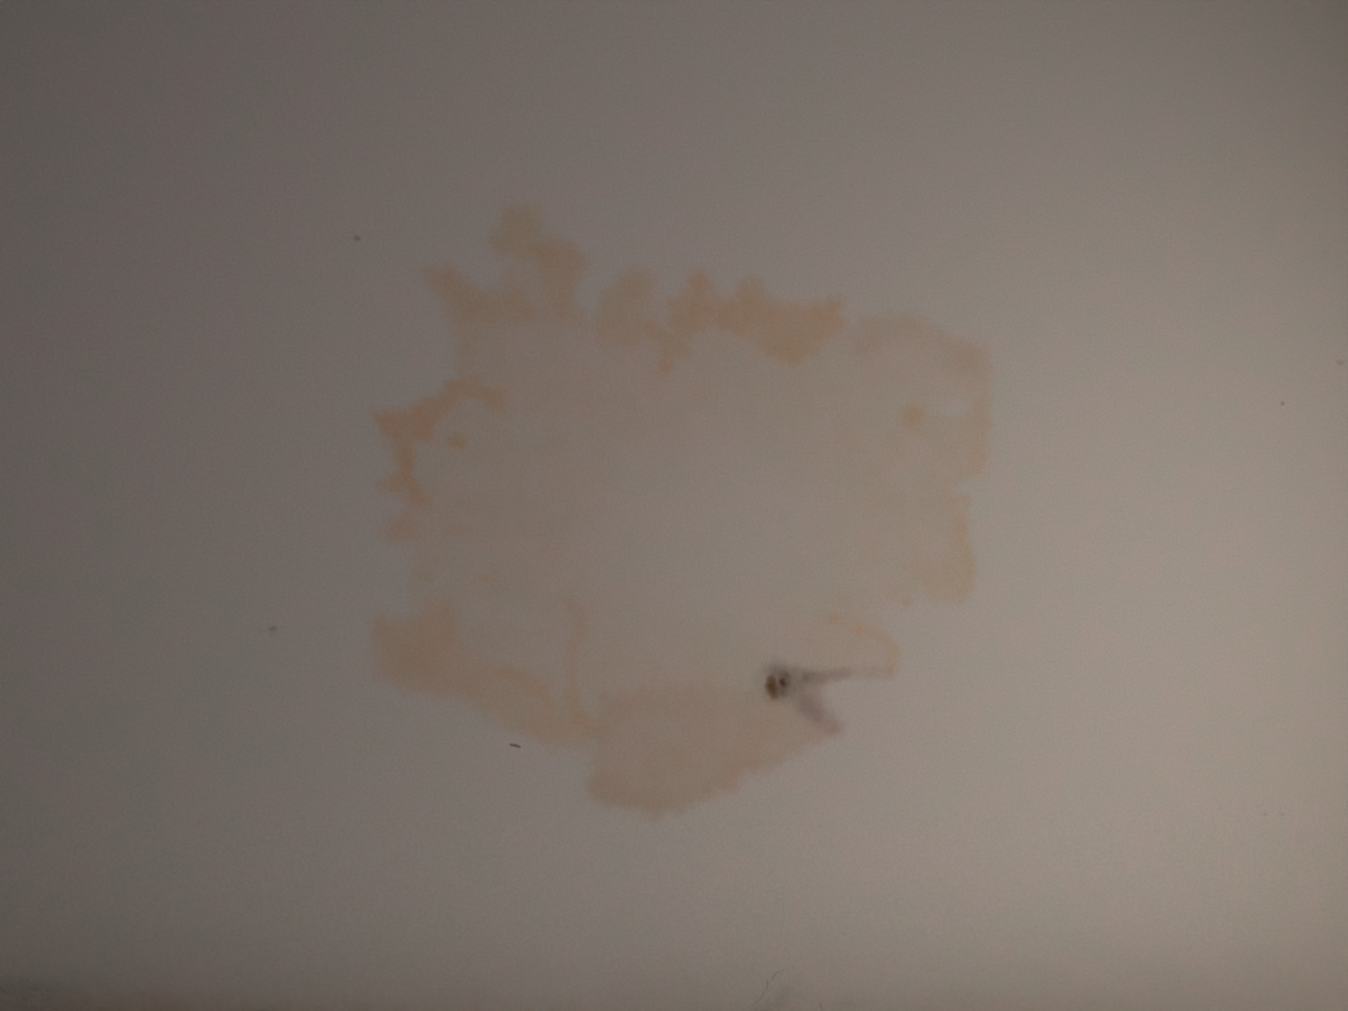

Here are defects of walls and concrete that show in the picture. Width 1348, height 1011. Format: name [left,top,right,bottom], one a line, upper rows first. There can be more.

water stain [357,191,1005,830]